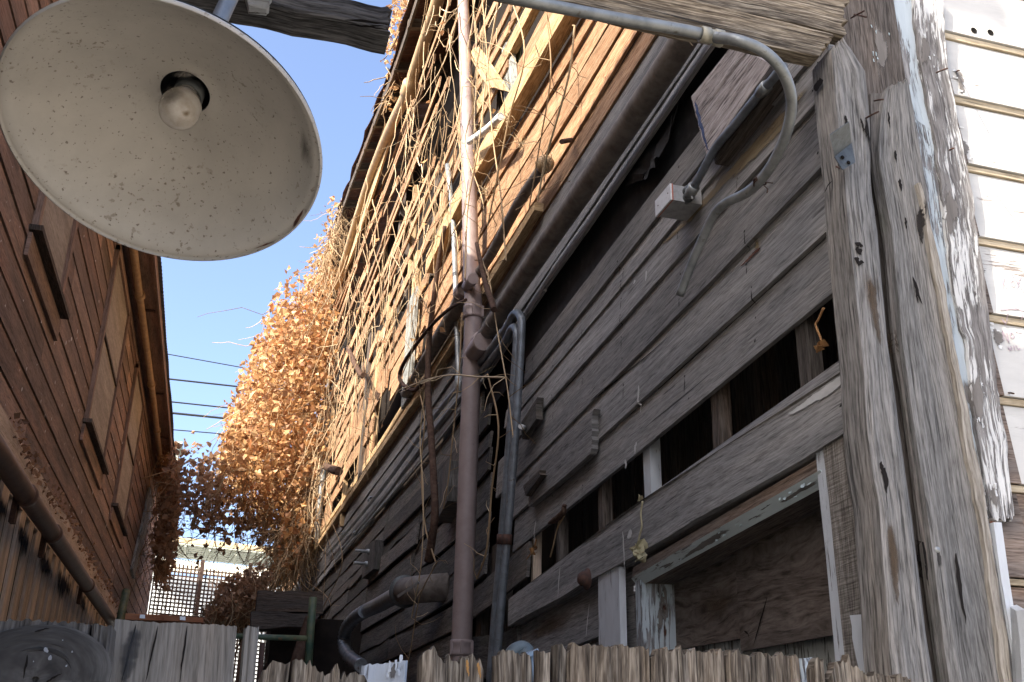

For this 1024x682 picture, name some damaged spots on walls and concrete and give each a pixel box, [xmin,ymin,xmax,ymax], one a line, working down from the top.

peeling [953,69,968,95]
peeling [937,191,959,251]
peeling [990,322,1003,349]
peeling [779,481,816,502]
peeling [680,523,742,561]
peeling [656,588,669,642]